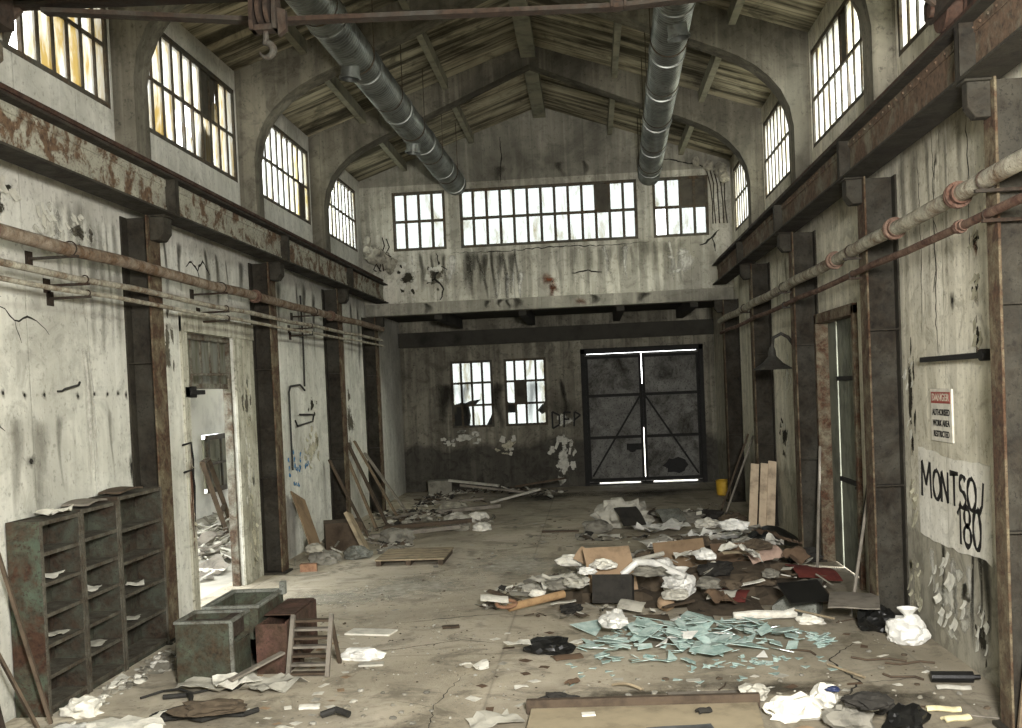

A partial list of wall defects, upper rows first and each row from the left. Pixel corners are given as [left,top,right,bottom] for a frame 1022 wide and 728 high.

leakage [411,251,523,306]
crack [0,296,49,343]